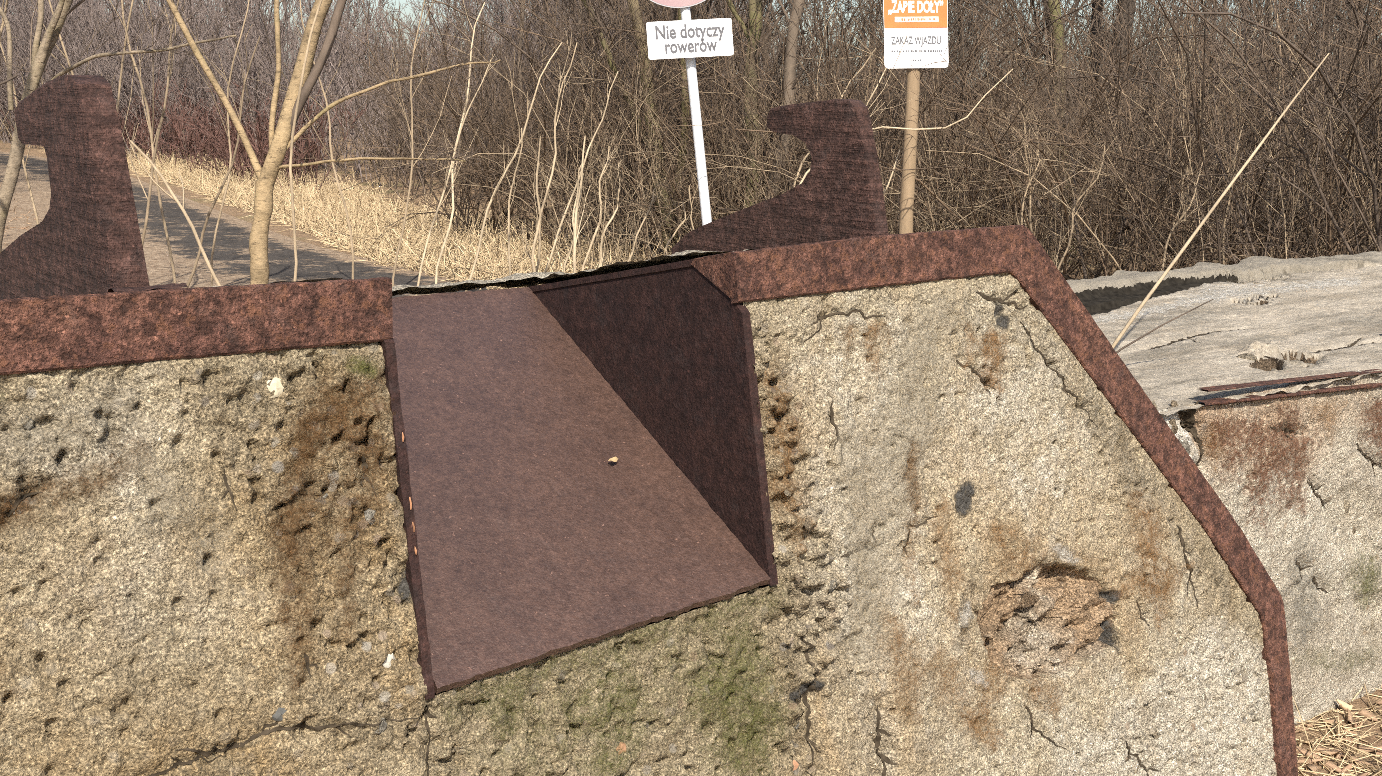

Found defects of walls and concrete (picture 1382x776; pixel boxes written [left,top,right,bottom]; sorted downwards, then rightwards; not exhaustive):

crack [804,309,893,341]
rust [298,380,392,472]
rust [1222,422,1306,504]
rust [1198,369,1382,436]
spalling [975,562,1116,682]
crack [148,699,436,776]